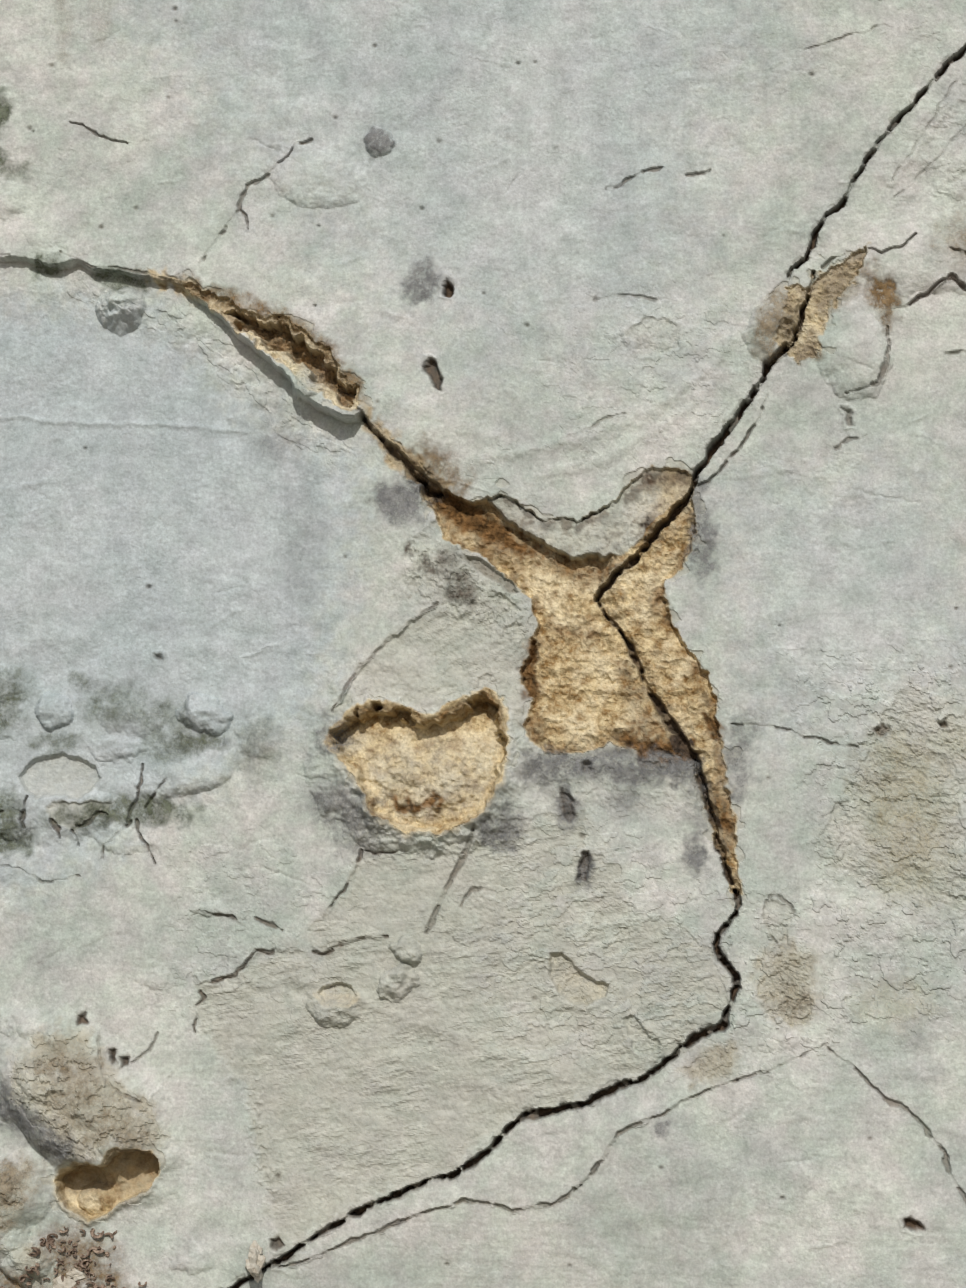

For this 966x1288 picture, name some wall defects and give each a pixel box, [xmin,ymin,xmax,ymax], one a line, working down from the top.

crack [804,23,895,52]
leakage [0,103,10,122]
crack [69,121,130,145]
crack [59,137,315,305]
spalling [177,270,374,415]
spalling [769,241,874,368]
crack [220,40,966,1288]
crack [0,763,169,886]
peeling [191,458,821,1253]
crack [190,909,286,1035]
crack [94,1029,161,1106]
spalling [41,1137,166,1226]